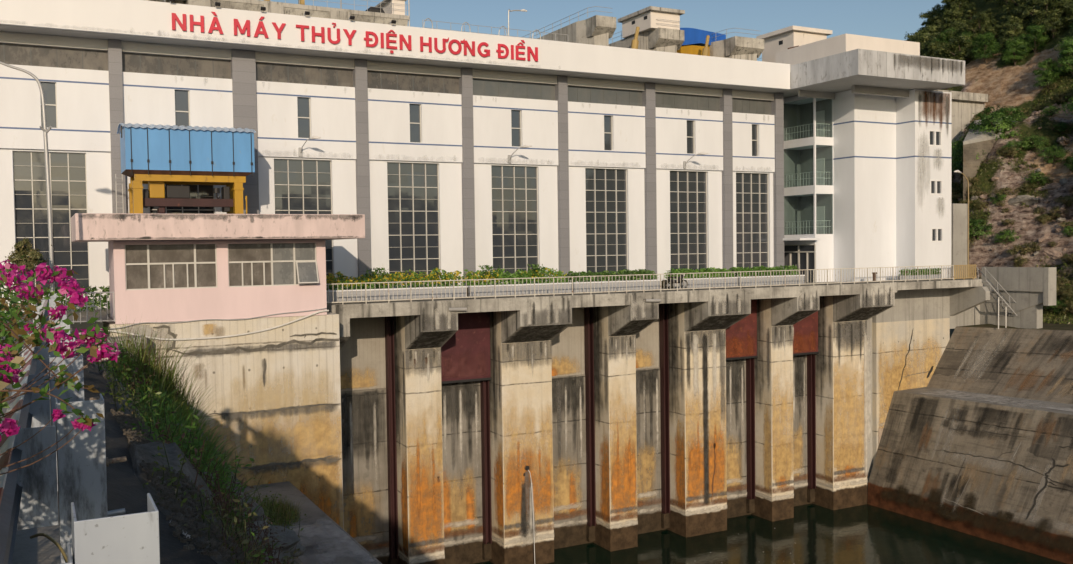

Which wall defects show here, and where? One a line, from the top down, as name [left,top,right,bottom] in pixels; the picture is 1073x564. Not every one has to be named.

crack [898,330,934,389]
water stain [201,288,1073,564]
rust [401,448,475,551]
rust [494,447,579,527]
rust [601,441,654,521]
rust [676,429,740,506]
crack [933,426,1073,519]